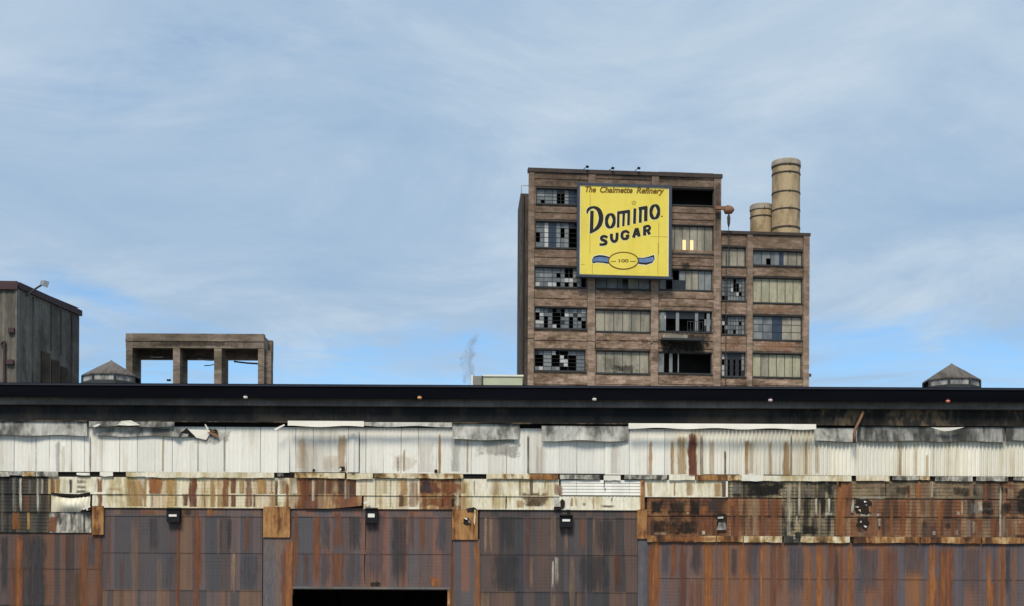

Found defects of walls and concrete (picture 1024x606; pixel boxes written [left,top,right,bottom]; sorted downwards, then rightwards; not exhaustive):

rust [13,513,30,606]
rust [89,439,102,507]
rust [128,434,360,606]
rust [474,518,492,606]
water stain [481,439,520,457]
rust [671,434,703,495]
rust [769,437,792,475]
rust [808,483,854,606]
peeling [851,497,884,530]
rust [873,484,1015,606]